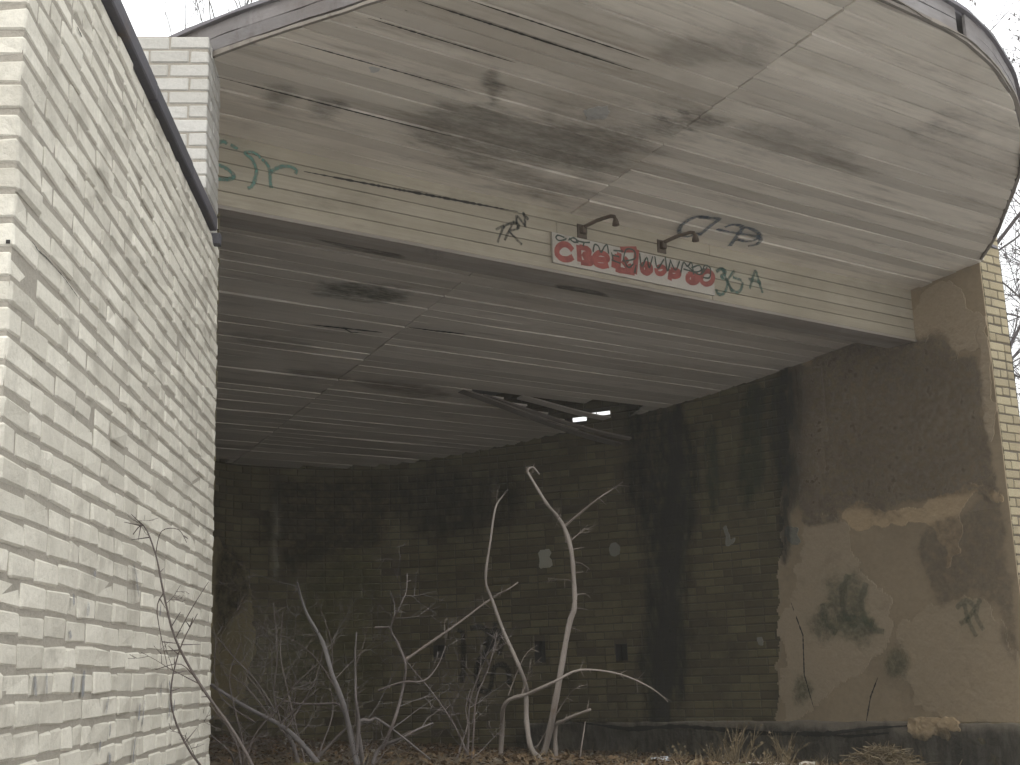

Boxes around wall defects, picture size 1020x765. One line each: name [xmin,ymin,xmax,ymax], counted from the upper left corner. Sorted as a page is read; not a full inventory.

flaking render [913,280,997,442]
flaking render [210,536,257,720]
crack [578,603,907,738]
leakage [524,403,1020,765]
flaking render [777,484,1020,723]